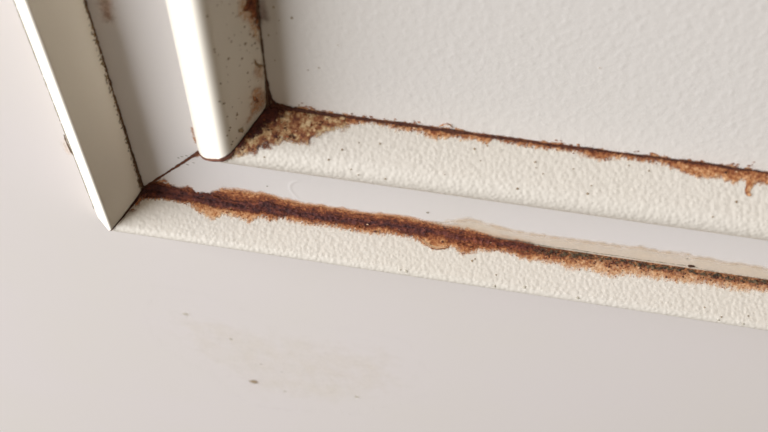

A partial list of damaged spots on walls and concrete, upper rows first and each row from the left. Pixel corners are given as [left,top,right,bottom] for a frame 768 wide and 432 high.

corrosion [226,61,768,196]
corrosion [140,181,768,292]